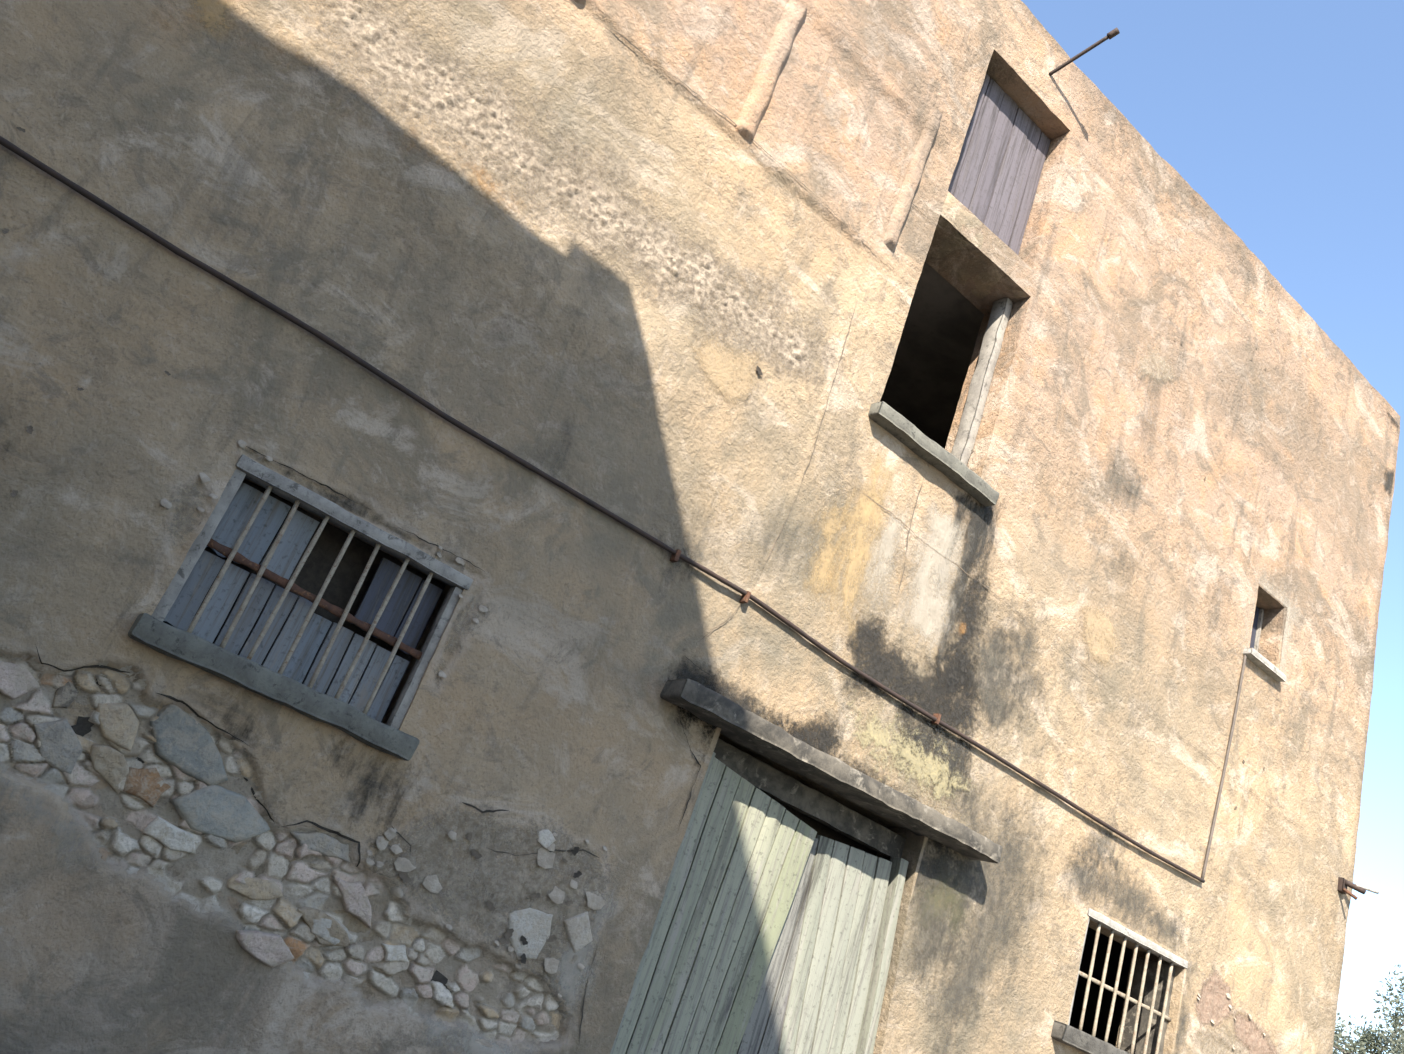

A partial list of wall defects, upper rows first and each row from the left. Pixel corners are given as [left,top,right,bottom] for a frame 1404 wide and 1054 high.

flaking render [0,647,608,1050]
leakage [668,660,838,754]
leakage [811,460,1036,1022]